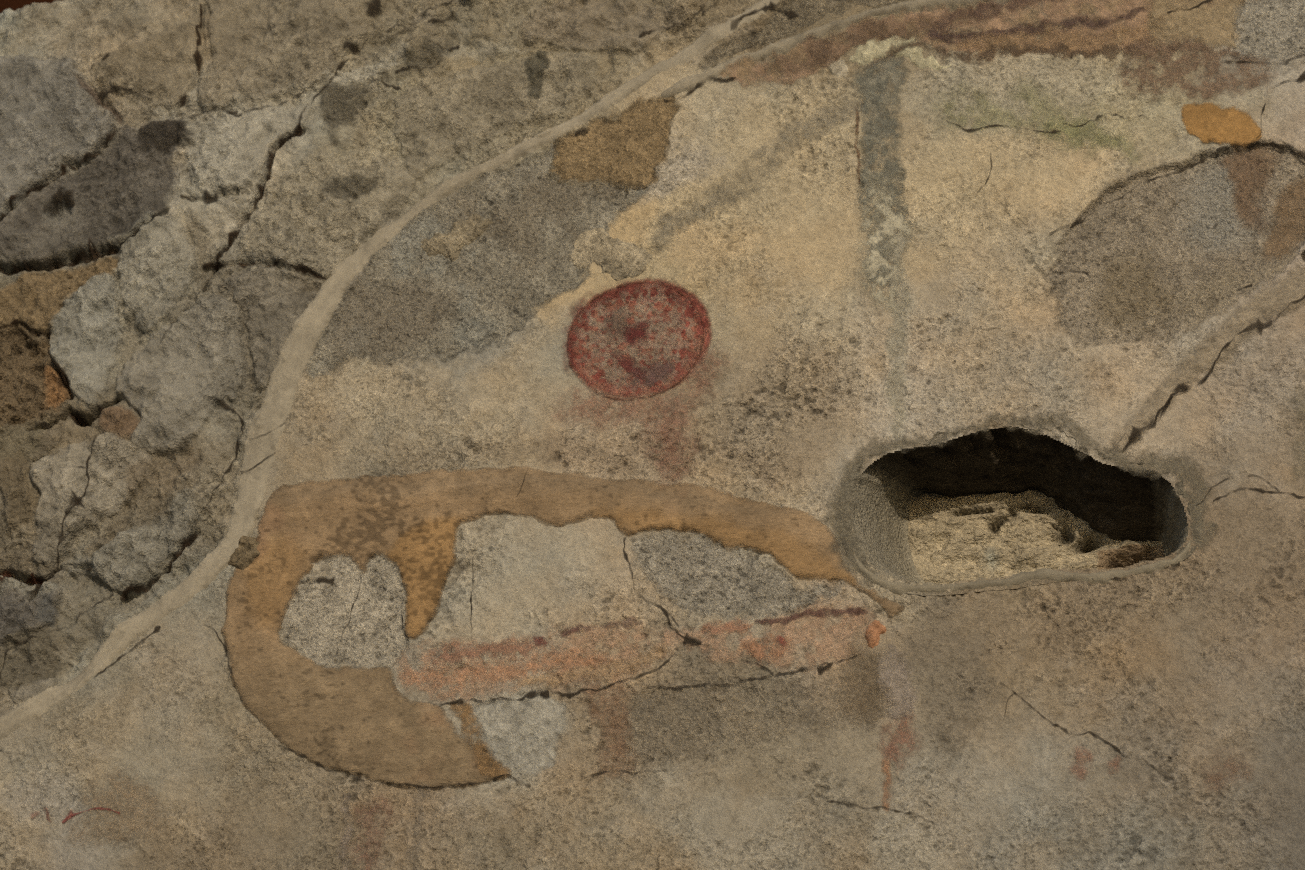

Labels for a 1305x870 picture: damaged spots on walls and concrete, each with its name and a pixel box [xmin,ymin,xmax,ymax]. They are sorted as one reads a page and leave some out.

crack [1167,0,1212,13]
crack [84,47,152,101]
crack [44,190,74,211]
spalling [1047,140,1305,344]
crack [1122,295,1305,450]
crack [57,432,100,565]
crack [209,399,270,502]
crack [433,537,857,705]
crack [1011,691,1174,779]